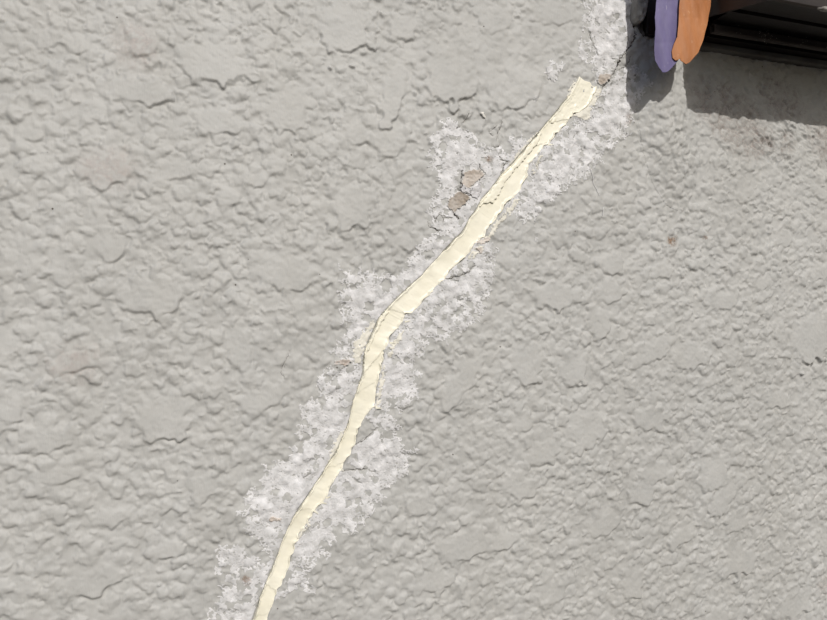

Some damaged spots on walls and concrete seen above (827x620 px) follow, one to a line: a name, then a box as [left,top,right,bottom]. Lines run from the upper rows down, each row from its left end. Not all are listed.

peeling [207,117,529,620]
crack [253,26,637,620]